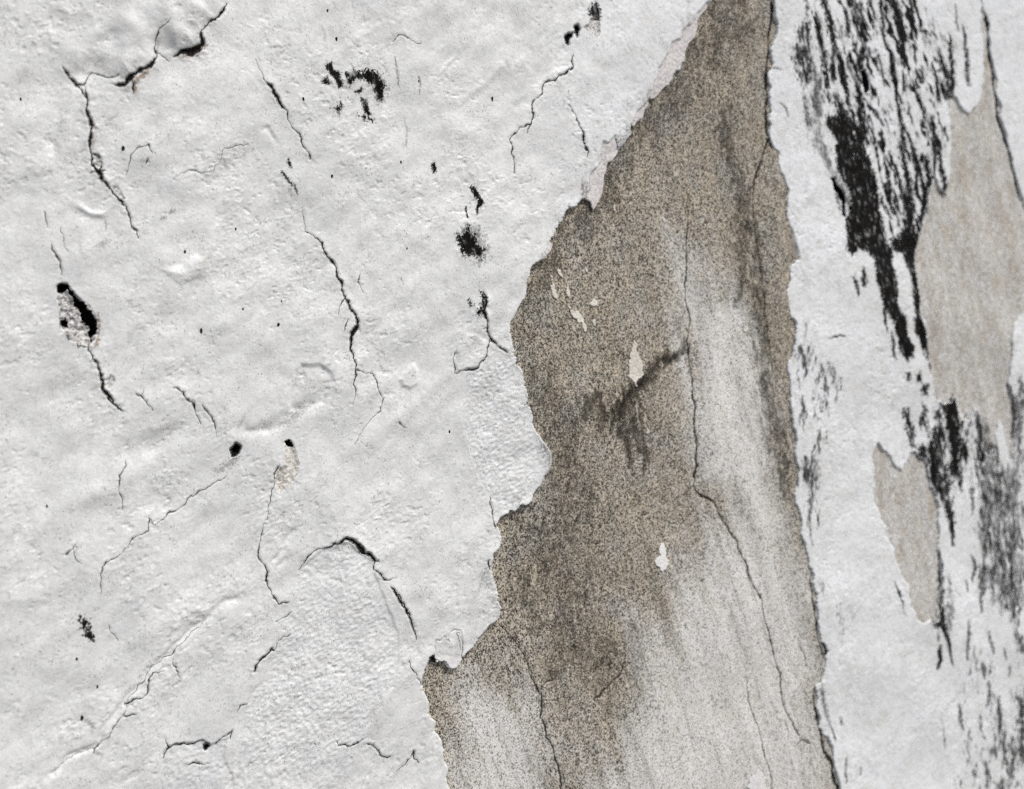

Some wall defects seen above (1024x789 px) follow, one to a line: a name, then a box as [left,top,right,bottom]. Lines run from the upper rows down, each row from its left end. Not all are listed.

crack [62,3,227,238]
crack [255,58,311,159]
mould [320,61,387,123]
crack [300,537,422,685]
mould [456,183,487,261]
crack [453,291,508,374]
leakage [513,347,685,687]
peeling [421,0,838,789]
crack [683,203,839,789]
peeling [872,443,940,623]
mould [791,0,1024,789]
peeling [915,8,1024,460]